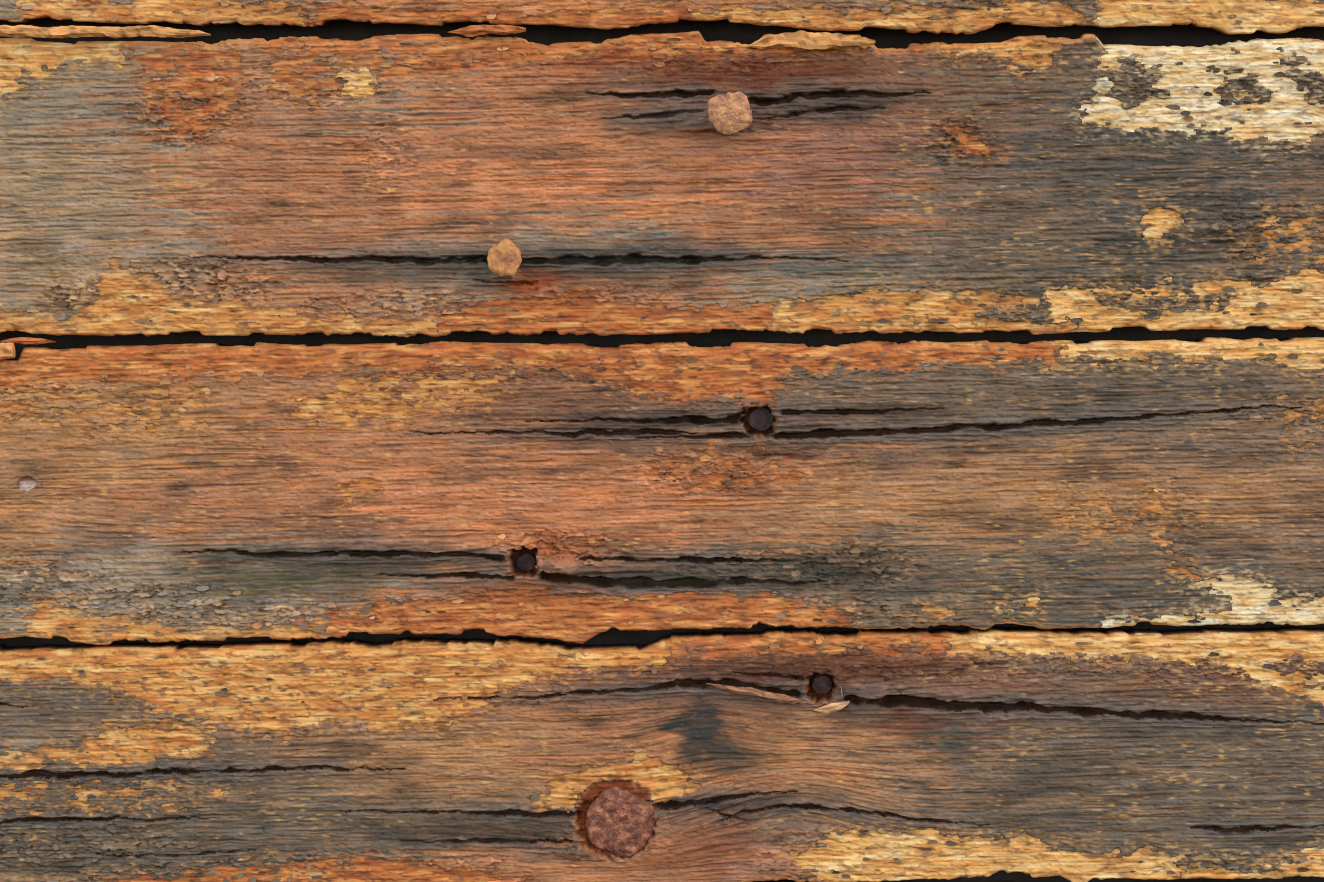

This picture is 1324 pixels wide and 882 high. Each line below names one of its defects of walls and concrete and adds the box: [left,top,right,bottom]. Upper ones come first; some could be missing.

peeling [0,0,1324,144]
crack [413,405,1302,440]
crack [181,549,827,589]
peeling [0,489,1324,825]